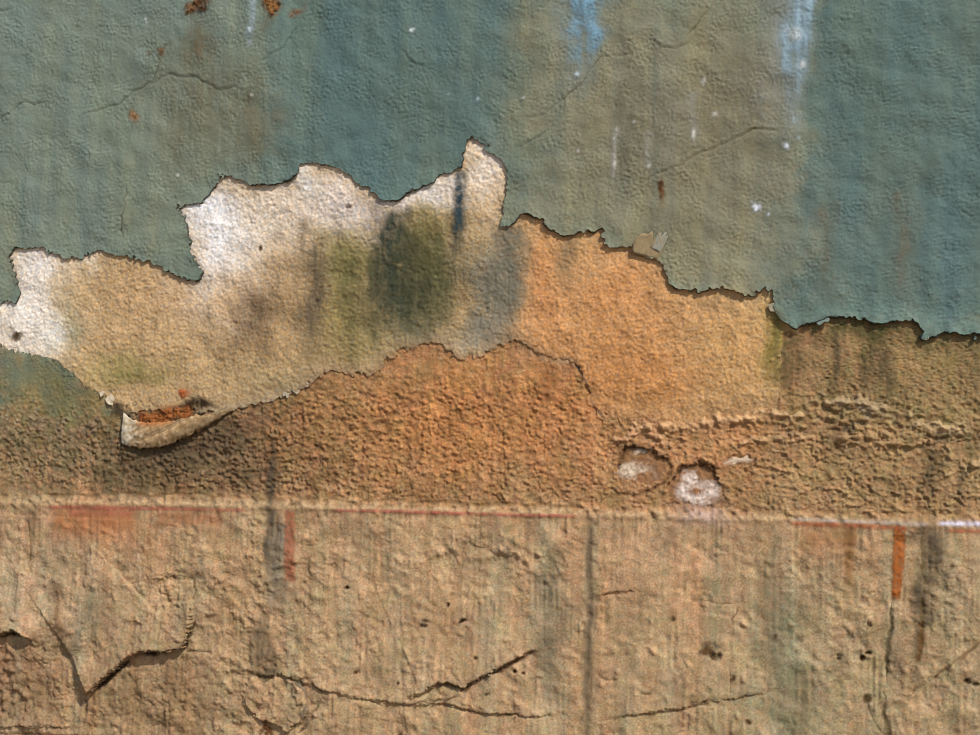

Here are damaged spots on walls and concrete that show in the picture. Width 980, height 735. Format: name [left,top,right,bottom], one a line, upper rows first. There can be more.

corrosion [185,0,209,14]
corrosion [262,0,281,15]
leakage [453,173,465,255]
peeling [0,136,521,451]
leakage [368,213,443,315]
flaking render [0,214,980,735]
crack [86,623,208,710]
crack [418,652,532,703]
crack [869,605,894,735]
crack [918,600,926,652]